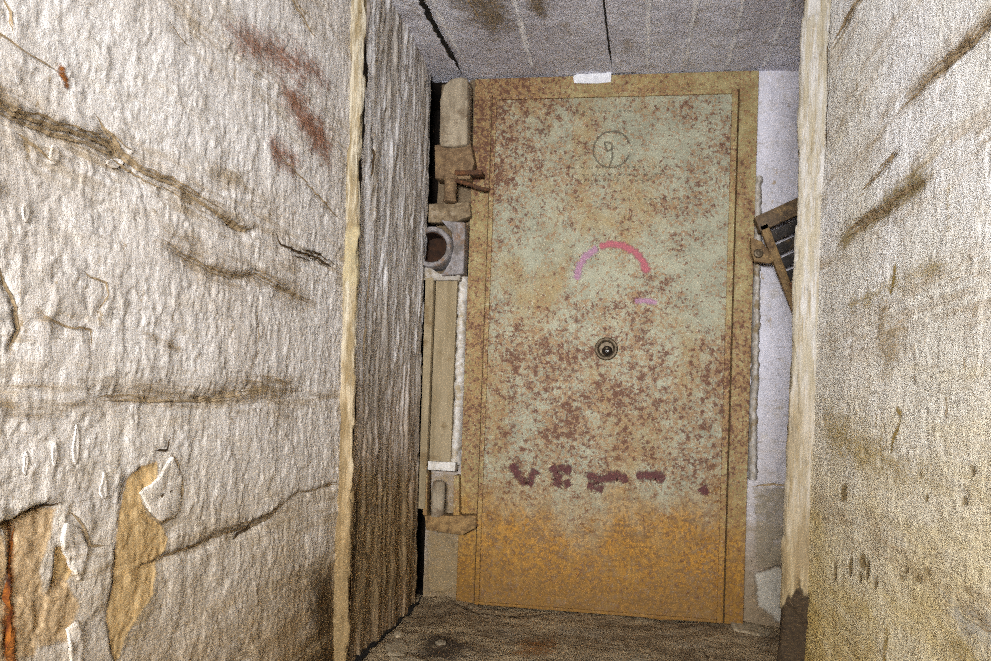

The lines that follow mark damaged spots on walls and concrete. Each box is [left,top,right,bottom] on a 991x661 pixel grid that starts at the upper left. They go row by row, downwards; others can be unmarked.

crack [419,0,465,74]
rust [232,26,330,161]
rust [271,137,299,172]
crack [369,127,377,176]
rust [437,182,445,204]
rust [456,184,471,204]
peeling [71,424,79,465]
peeling [99,472,107,499]
spalling [0,501,103,661]
peeling [106,437,184,661]
crack [129,482,358,617]
crack [354,595,423,661]